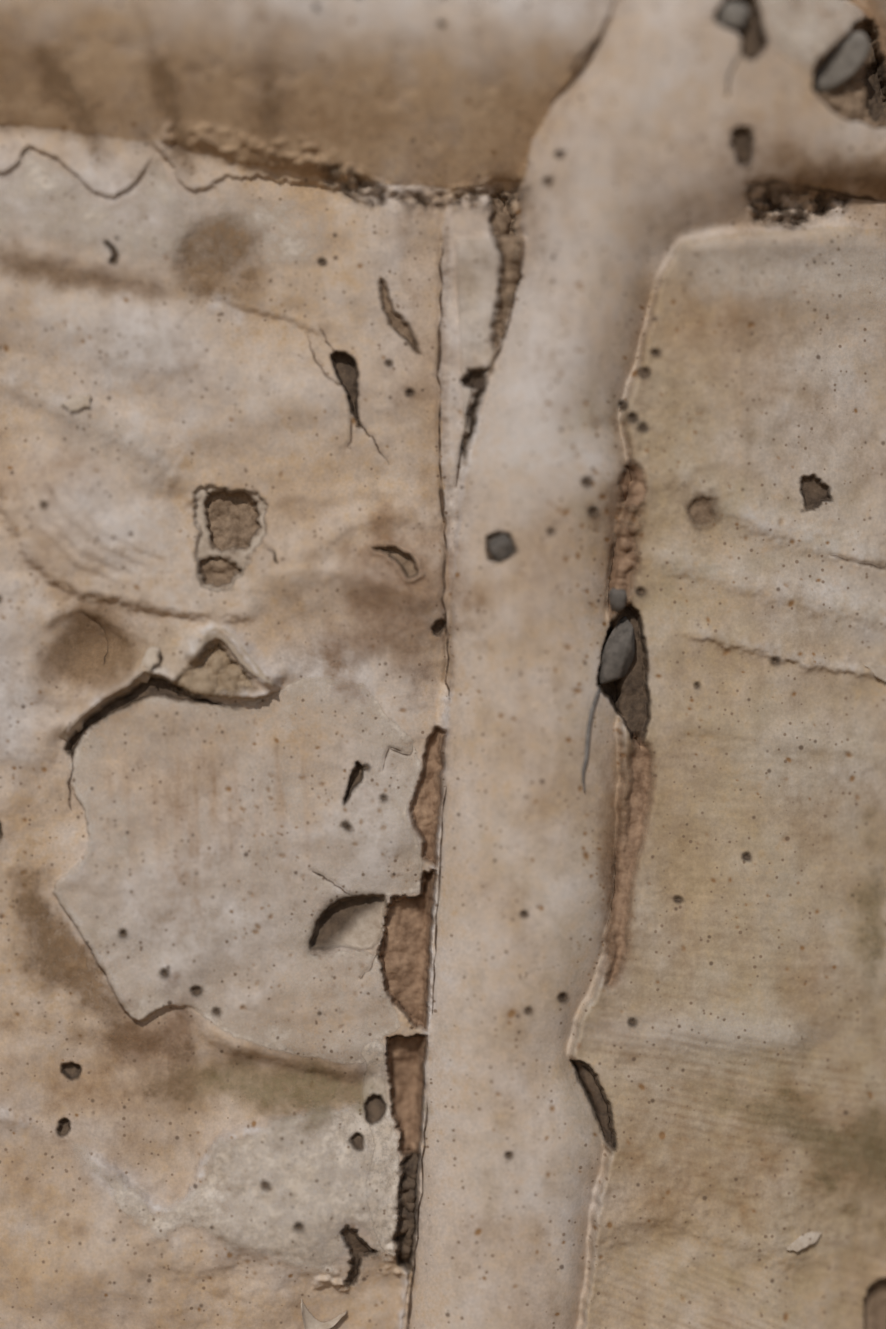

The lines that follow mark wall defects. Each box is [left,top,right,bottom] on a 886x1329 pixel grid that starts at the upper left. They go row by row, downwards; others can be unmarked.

spalling [748,184,847,228]
crack [436,242,515,696]
peeling [54,627,446,1287]
crack [432,786,447,1013]